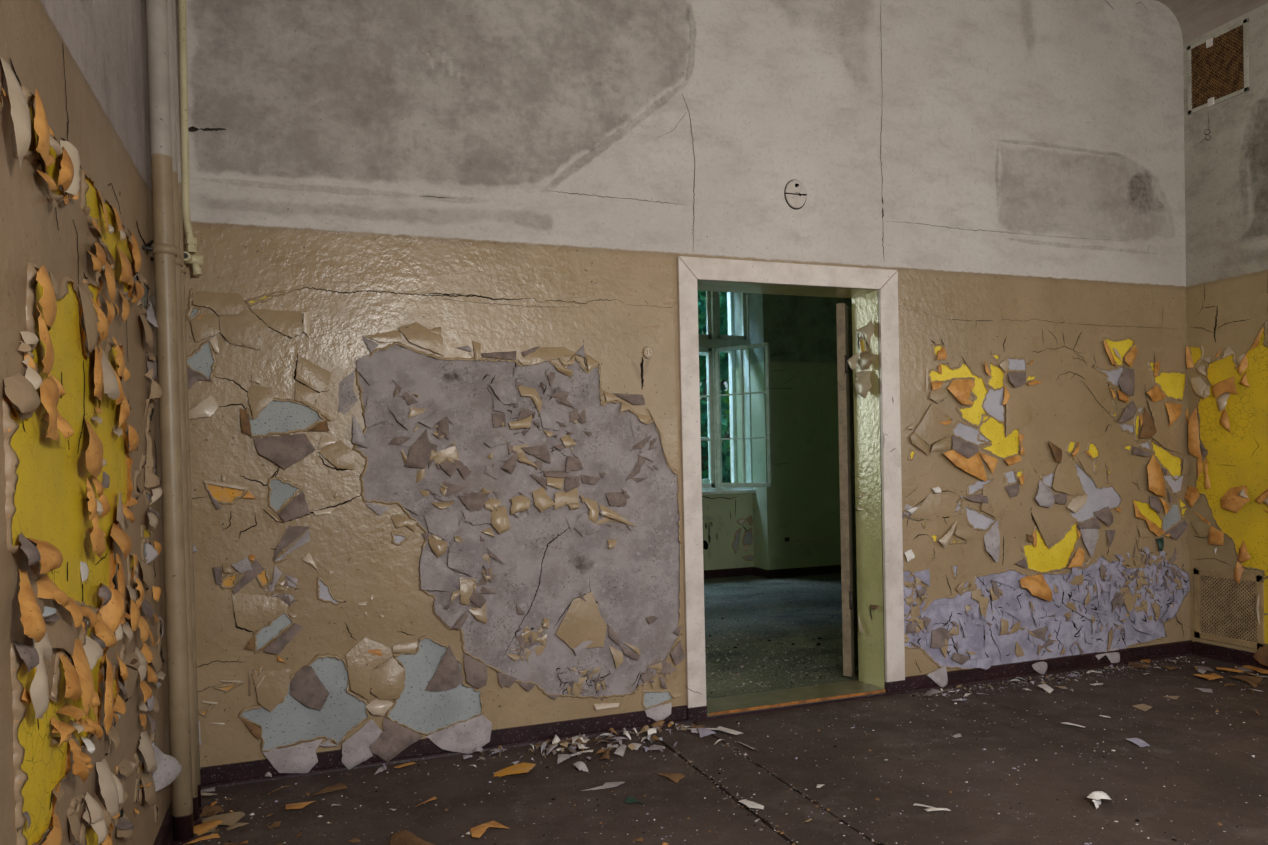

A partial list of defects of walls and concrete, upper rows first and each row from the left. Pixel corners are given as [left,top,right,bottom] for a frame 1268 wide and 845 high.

peeling [0,57,182,845]
peeling [186,288,685,777]
crack [291,287,677,308]
crack [545,95,695,252]
peeling [902,320,1268,693]
peeling [688,726,742,735]